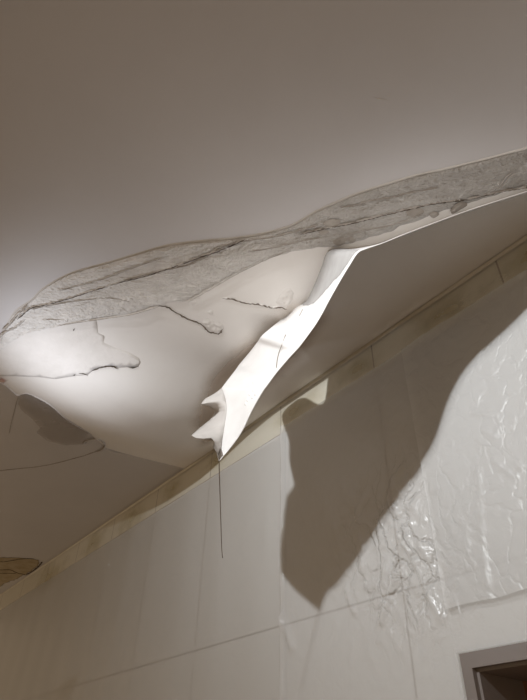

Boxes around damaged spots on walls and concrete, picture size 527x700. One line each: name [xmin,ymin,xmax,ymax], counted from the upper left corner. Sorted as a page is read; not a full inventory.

flaking render [0,147,527,558]
water stain [0,557,43,586]